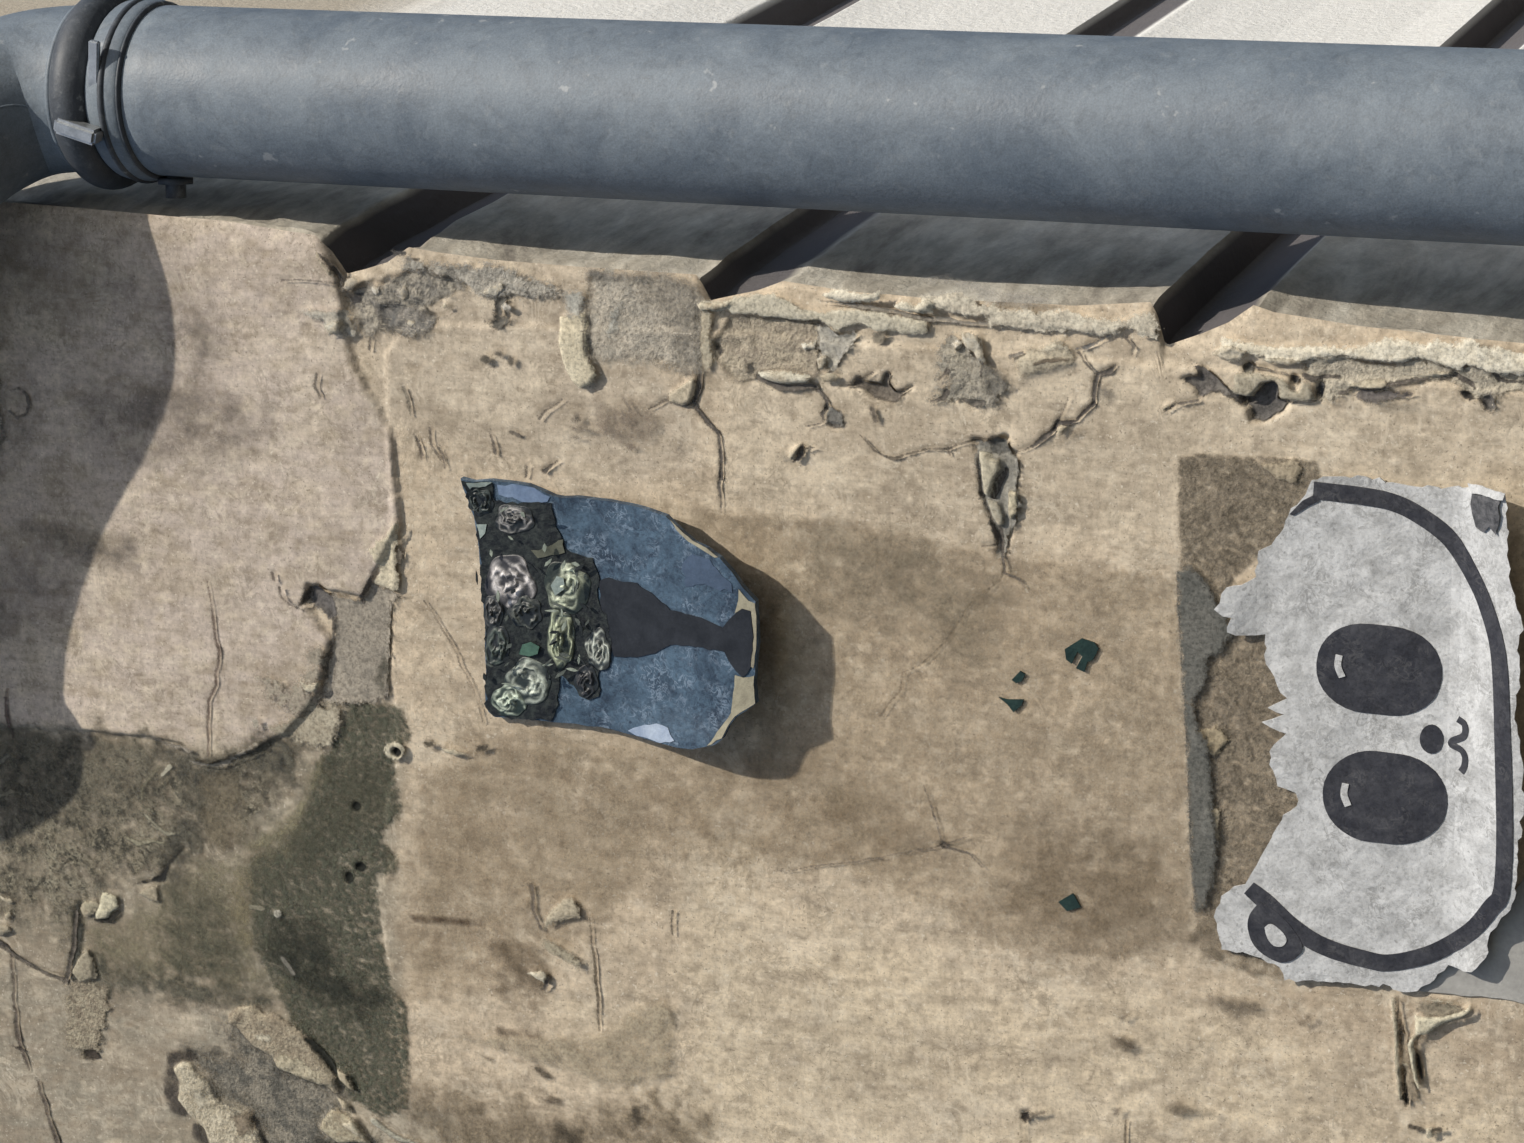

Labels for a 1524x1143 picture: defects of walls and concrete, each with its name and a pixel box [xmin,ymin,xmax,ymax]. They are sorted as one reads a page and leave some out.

crack [282,243,344,286]
crack [313,373,321,397]
crack [648,299,724,510]
spalling [324,250,1160,422]
crack [807,335,1135,460]
peeling [1157,336,1524,421]
peeling [270,572,399,706]
crack [0,910,78,1143]
leakage [69,877,270,1006]
spalling [164,1017,375,1143]
leakage [274,926,385,1016]